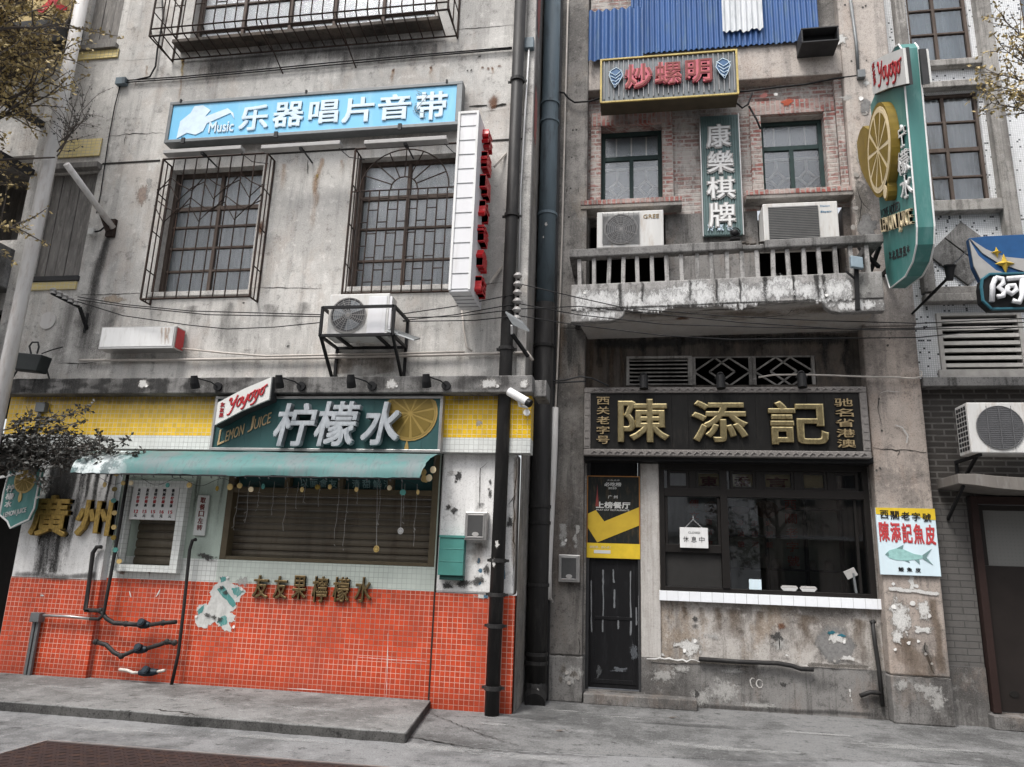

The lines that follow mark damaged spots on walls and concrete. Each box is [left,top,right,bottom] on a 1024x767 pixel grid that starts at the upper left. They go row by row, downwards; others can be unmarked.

leakage [586,274,827,320]
crack [873,391,927,454]
leakage [19,452,113,580]
peeling [443,562,496,589]
peeling [597,633,755,678]
peeling [770,623,789,657]
spalling [805,640,869,669]
peeling [887,582,935,674]